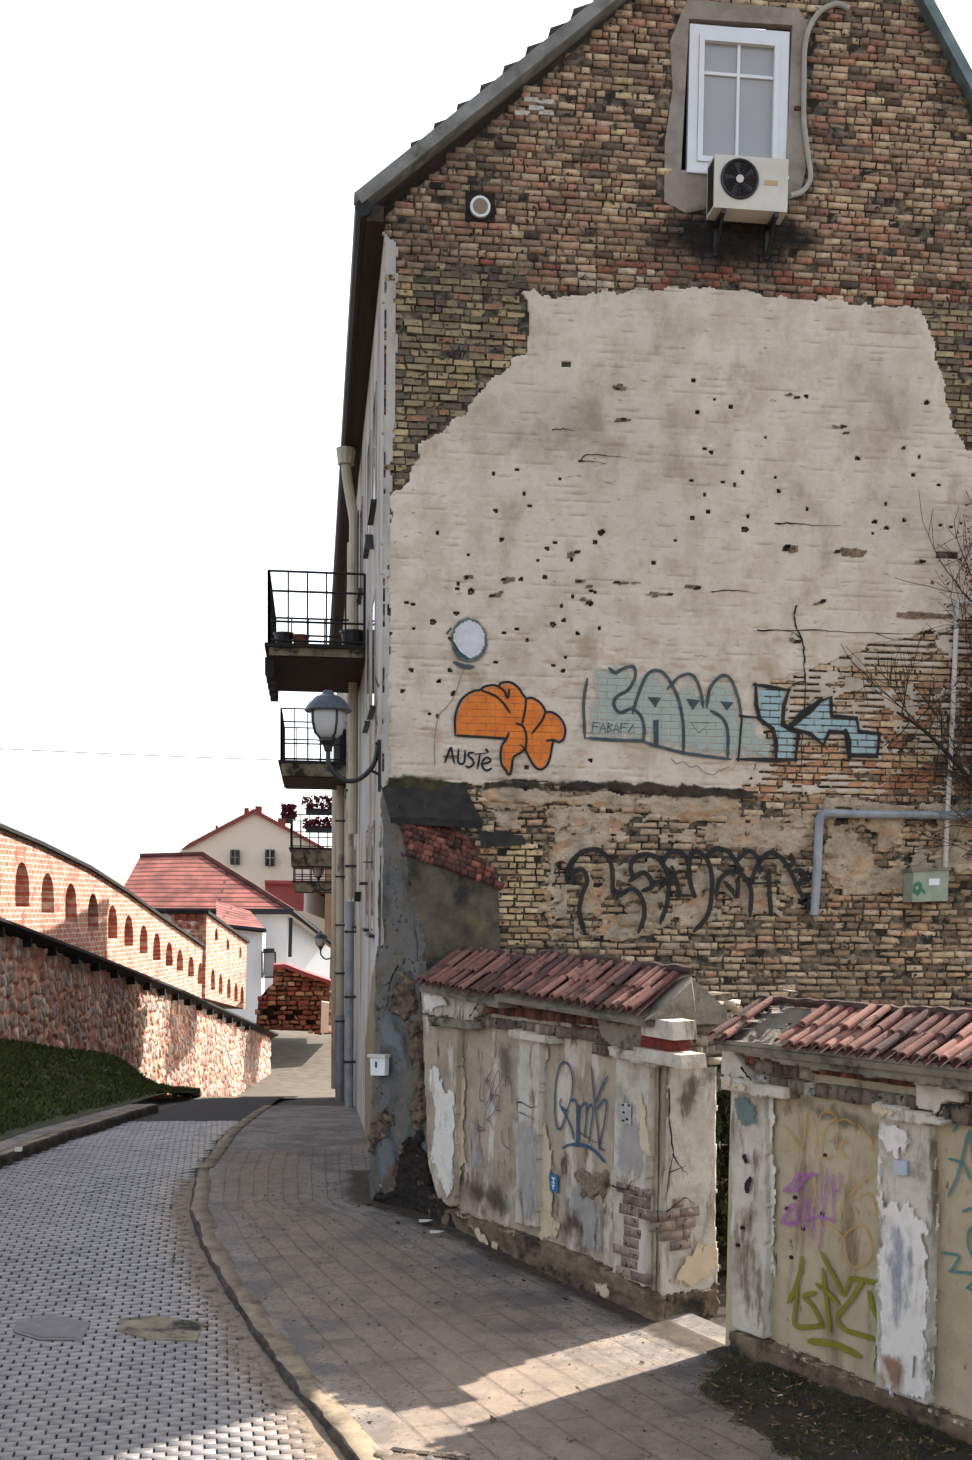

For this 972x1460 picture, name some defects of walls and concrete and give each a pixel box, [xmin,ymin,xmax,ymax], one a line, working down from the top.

flaking render [383,264,527,496]
flaking render [913,300,972,442]
spalling [455,575,523,598]
spalling [536,530,605,579]
spalling [550,579,701,635]
spalling [782,544,798,553]
spalling [834,519,905,558]
flaking render [728,611,972,803]
flaking render [396,804,505,891]
spalling [367,970,499,1250]
flaking render [513,1120,721,1319]
peeling [872,1103,940,1400]